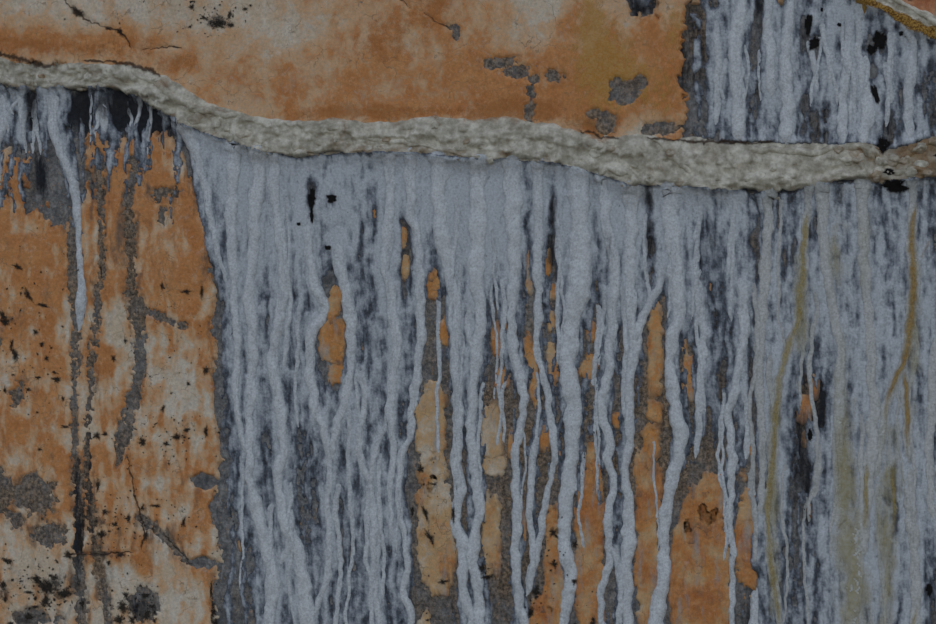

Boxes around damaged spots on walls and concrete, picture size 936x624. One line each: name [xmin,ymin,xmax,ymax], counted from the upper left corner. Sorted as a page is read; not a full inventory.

crack [0,52,56,68]
crack [65,0,181,75]
peeling [483,56,566,122]
peeling [585,74,648,136]
peeling [641,0,737,145]
peeling [749,0,764,72]
peeling [799,8,823,60]
peeling [877,89,903,153]
corrosion [855,0,936,39]
peeling [0,89,193,624]
damp [144,415,195,465]
damp [210,583,218,624]